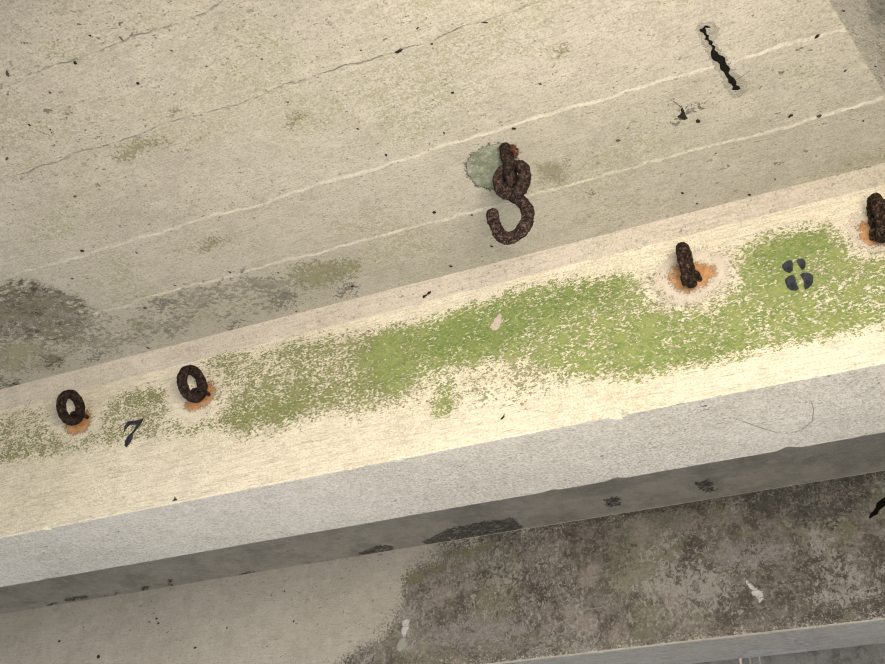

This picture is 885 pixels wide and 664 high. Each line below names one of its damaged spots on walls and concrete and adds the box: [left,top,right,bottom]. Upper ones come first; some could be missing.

crack [695,21,751,98]
water stain [841,212,885,252]
rust [854,221,885,246]
water stain [651,248,731,307]
rust [666,261,718,294]
water stain [0,259,359,387]
rust [184,380,216,411]
rust [65,410,92,435]
crack [869,497,885,518]
water stain [339,471,885,664]